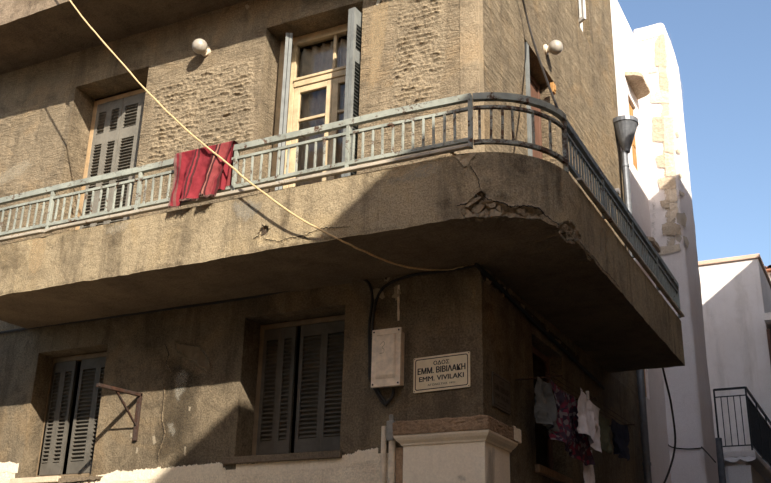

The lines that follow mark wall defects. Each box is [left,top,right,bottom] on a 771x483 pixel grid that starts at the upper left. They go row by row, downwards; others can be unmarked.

crack [265,226,349,243]
spalling [461,190,545,222]
crack [450,152,620,288]